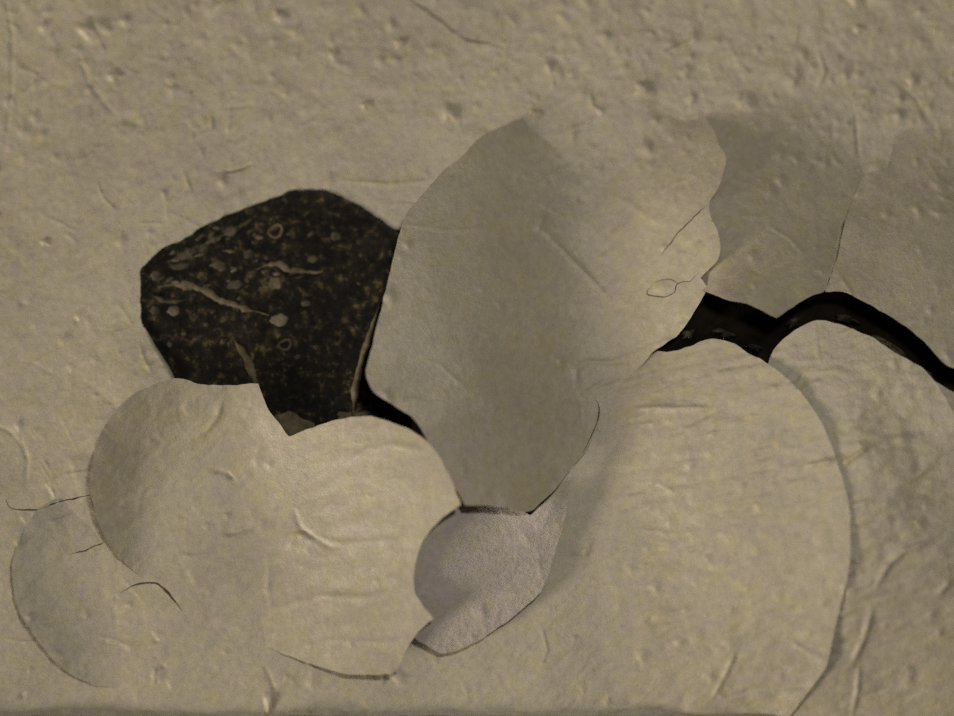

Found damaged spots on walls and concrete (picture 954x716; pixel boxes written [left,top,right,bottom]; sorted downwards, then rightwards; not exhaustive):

crack [662,208,703,254]
peeling [90,93,954,716]
crack [646,278,954,392]
peeling [12,499,121,688]